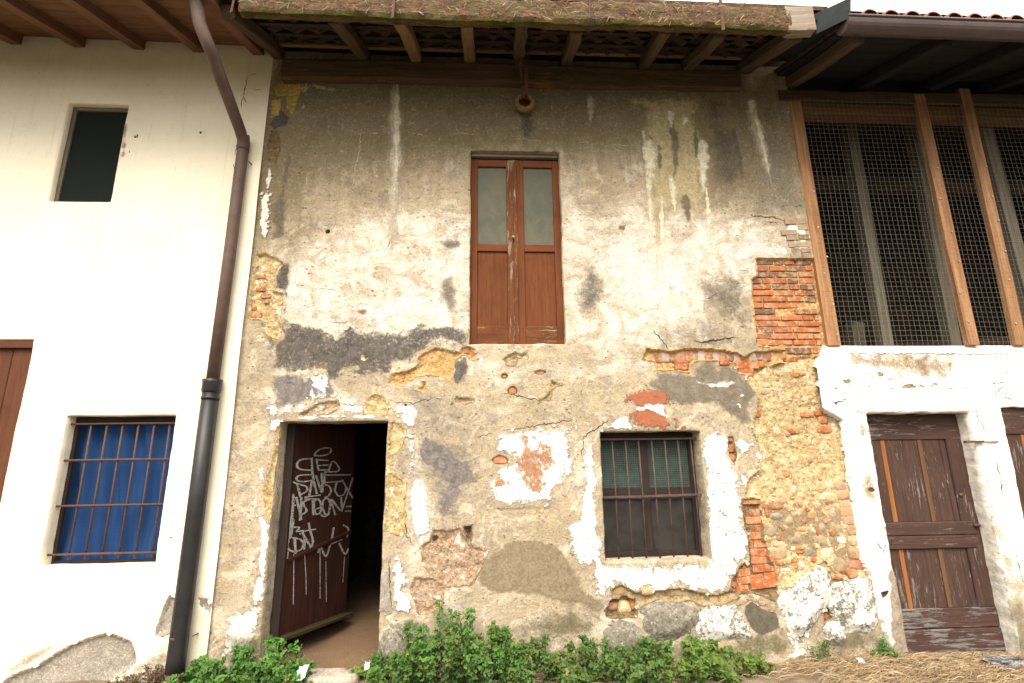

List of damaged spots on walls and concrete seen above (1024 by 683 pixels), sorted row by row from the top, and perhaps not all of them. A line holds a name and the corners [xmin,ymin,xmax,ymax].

water stain [388,86,402,241]
water stain [584,96,791,319]
flaking render [247,252,285,340]
water stain [276,257,298,310]
water stain [267,279,468,405]
flaking render [388,346,478,392]
flaking render [484,218,872,619]
water stain [650,364,756,422]
flaking render [221,372,489,657]
water stain [415,438,477,513]
water stain [480,540,603,611]
flaking render [2,632,137,683]